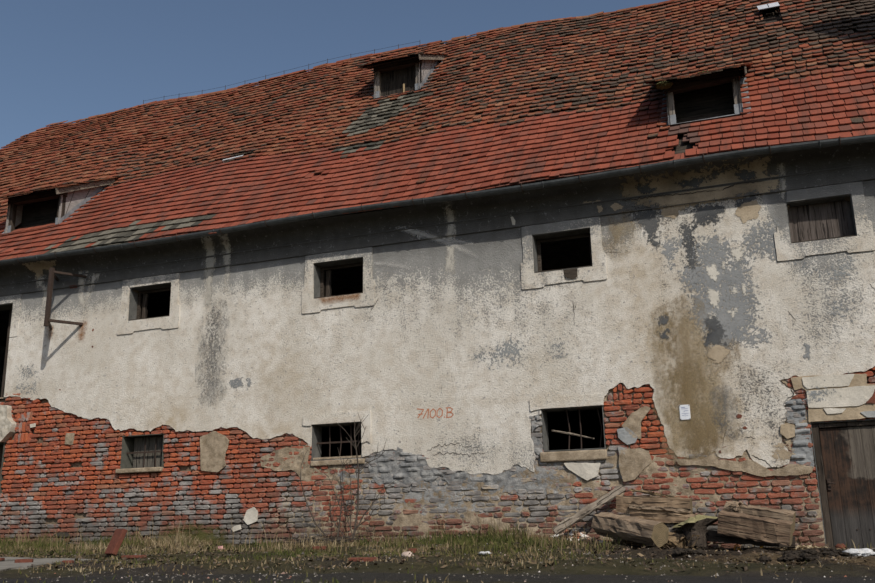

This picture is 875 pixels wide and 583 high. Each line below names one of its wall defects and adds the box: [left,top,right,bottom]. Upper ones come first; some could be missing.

damp [199,234,231,400]
flaking render [0,364,875,550]
peeling [473,333,526,370]
peeling [580,156,786,366]
damp [655,314,743,453]
peeling [794,256,860,323]